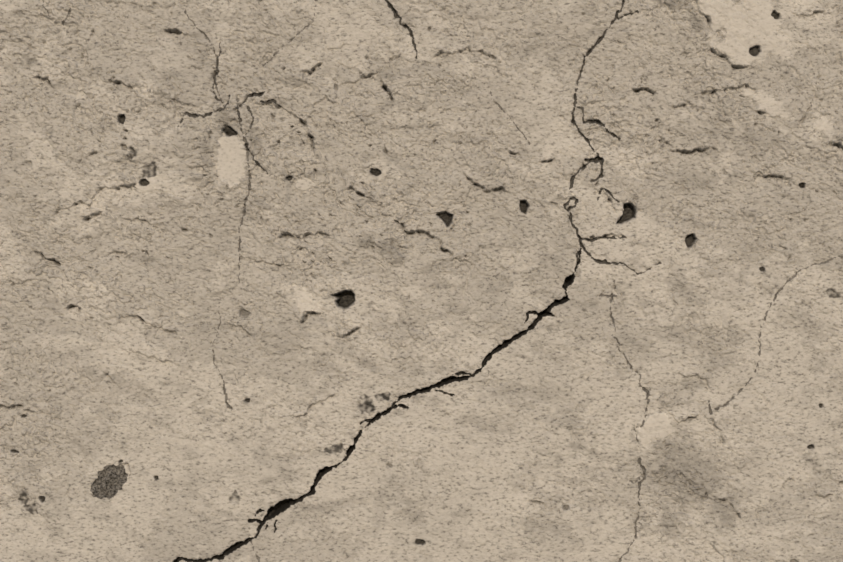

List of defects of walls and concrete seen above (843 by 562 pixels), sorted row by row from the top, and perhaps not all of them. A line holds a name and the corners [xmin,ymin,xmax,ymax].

crack [174,0,662,562]